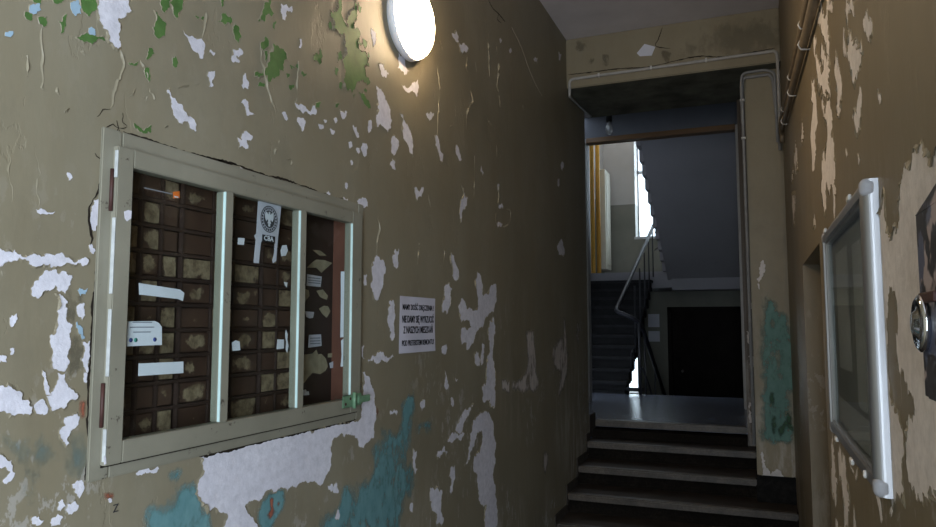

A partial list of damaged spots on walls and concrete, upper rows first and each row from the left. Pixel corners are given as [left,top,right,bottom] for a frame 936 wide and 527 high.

crack [88,184,99,245]
peeling [75,0,133,52]
crack [97,109,343,199]
peeling [282,28,419,170]
crack [569,29,774,75]
peeling [791,0,873,231]
peeling [0,243,96,448]
peeling [30,479,86,527]
peeling [195,344,394,527]
peeling [363,248,399,342]
peeling [429,251,498,527]
peeling [876,139,936,524]